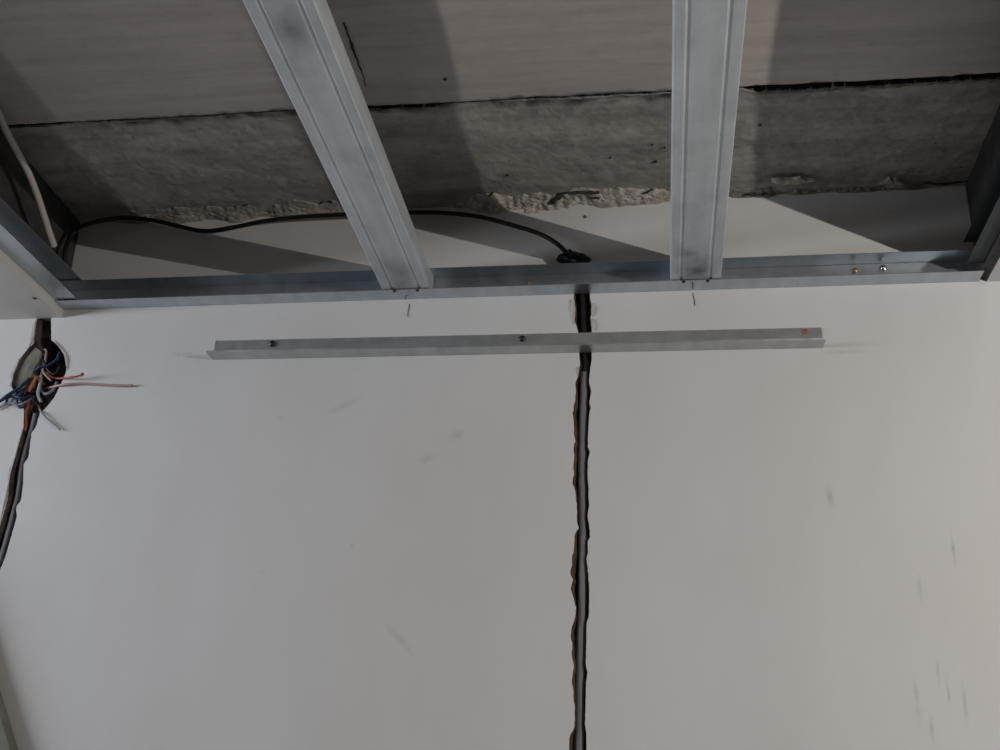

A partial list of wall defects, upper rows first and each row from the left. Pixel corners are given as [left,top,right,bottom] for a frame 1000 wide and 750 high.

peeling [0,110,345,224]
peeling [369,91,672,218]
peeling [729,76,1000,198]